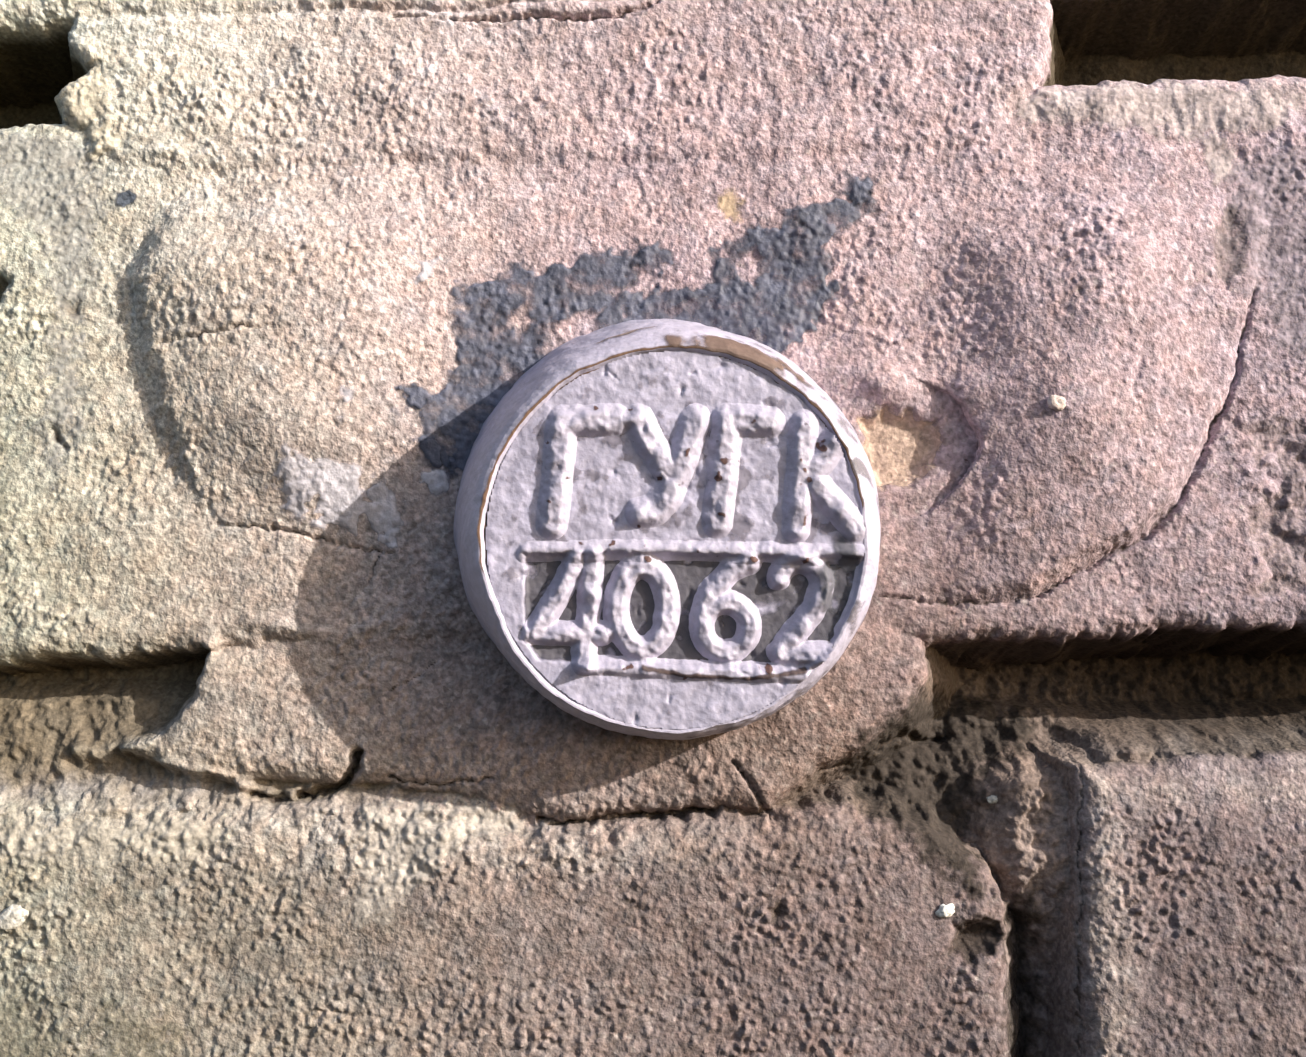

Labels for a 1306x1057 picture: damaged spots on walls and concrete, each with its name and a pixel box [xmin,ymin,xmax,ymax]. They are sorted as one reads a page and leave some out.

peeling [843,176,875,212]
peeling [631,241,674,278]
peeling [395,383,434,409]
crack [1201,414,1220,454]
peeling [419,437,456,495]
crack [253,751,362,803]
crack [389,775,489,785]